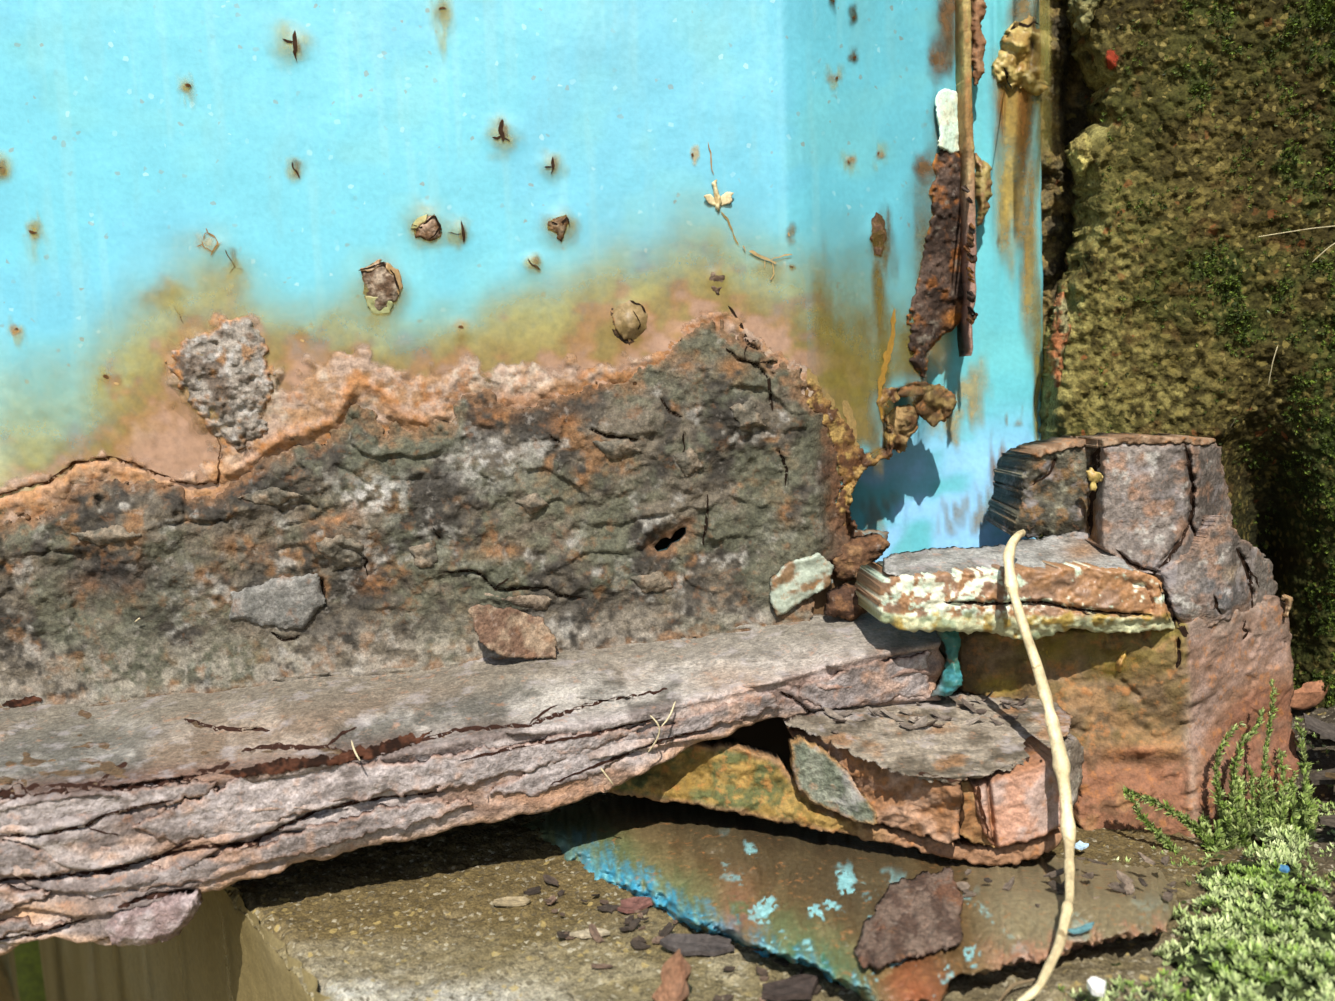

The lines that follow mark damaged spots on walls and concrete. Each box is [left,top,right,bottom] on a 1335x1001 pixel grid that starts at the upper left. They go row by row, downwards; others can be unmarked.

peeling [0,312,859,524]
corrosion [0,0,1051,708]
crack [442,570,587,599]
peeling [769,552,834,617]
crack [0,688,714,909]
crack [0,918,87,940]